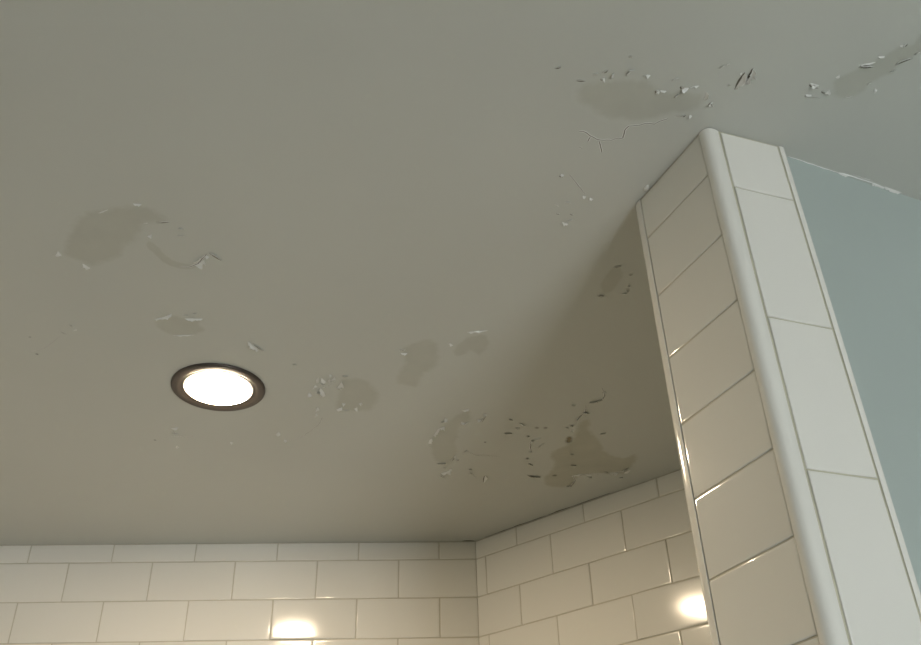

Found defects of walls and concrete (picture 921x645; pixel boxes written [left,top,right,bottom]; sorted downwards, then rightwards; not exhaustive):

peeling [805,28,921,103]